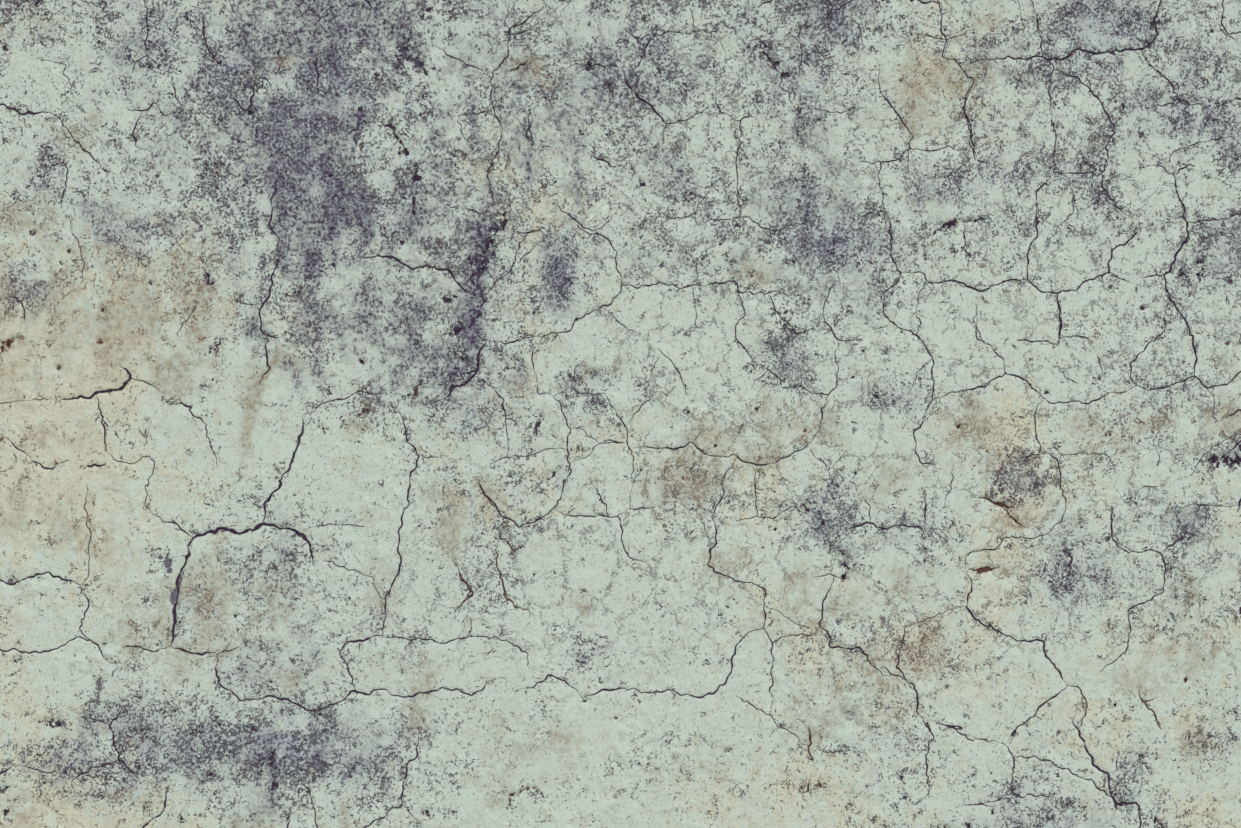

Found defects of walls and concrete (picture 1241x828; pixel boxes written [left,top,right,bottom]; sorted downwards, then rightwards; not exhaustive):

crack [0,57,106,299]
crack [128,0,181,149]
crack [235,172,281,384]
leakage [235,0,422,89]
leakage [236,104,486,390]
crack [434,0,569,214]
crack [571,10,811,231]
crack [856,0,1241,553]
crack [0,486,113,664]
crack [61,205,1142,828]
crack [1101,453,1185,672]
crack [0,707,169,828]